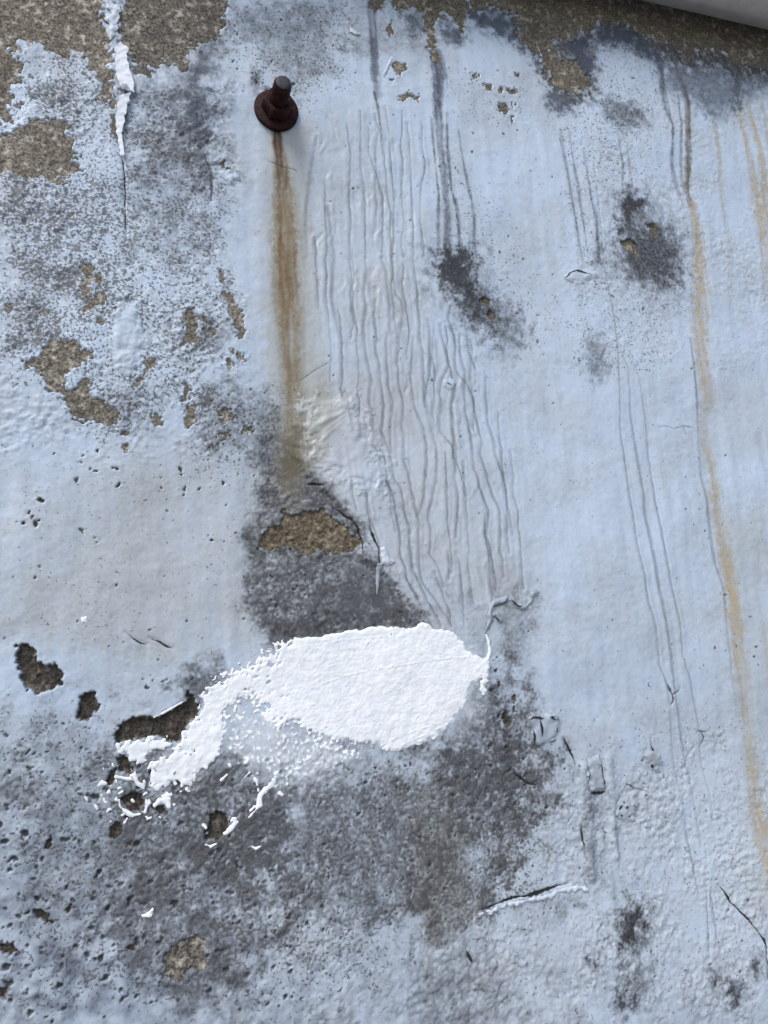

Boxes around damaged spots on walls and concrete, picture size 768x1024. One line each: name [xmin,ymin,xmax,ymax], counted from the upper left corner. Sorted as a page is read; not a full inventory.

leakage [469,12,540,64]
peeling [0,0,230,186]
crack [120,159,128,231]
corrosion [273,131,300,402]
leakage [431,18,508,335]
leakage [618,184,682,288]
corrosion [684,88,709,392]
corrosion [278,420,307,490]
crack [335,509,380,563]
spalling [16,644,63,694]
spalling [114,693,199,743]
crack [477,825,589,916]